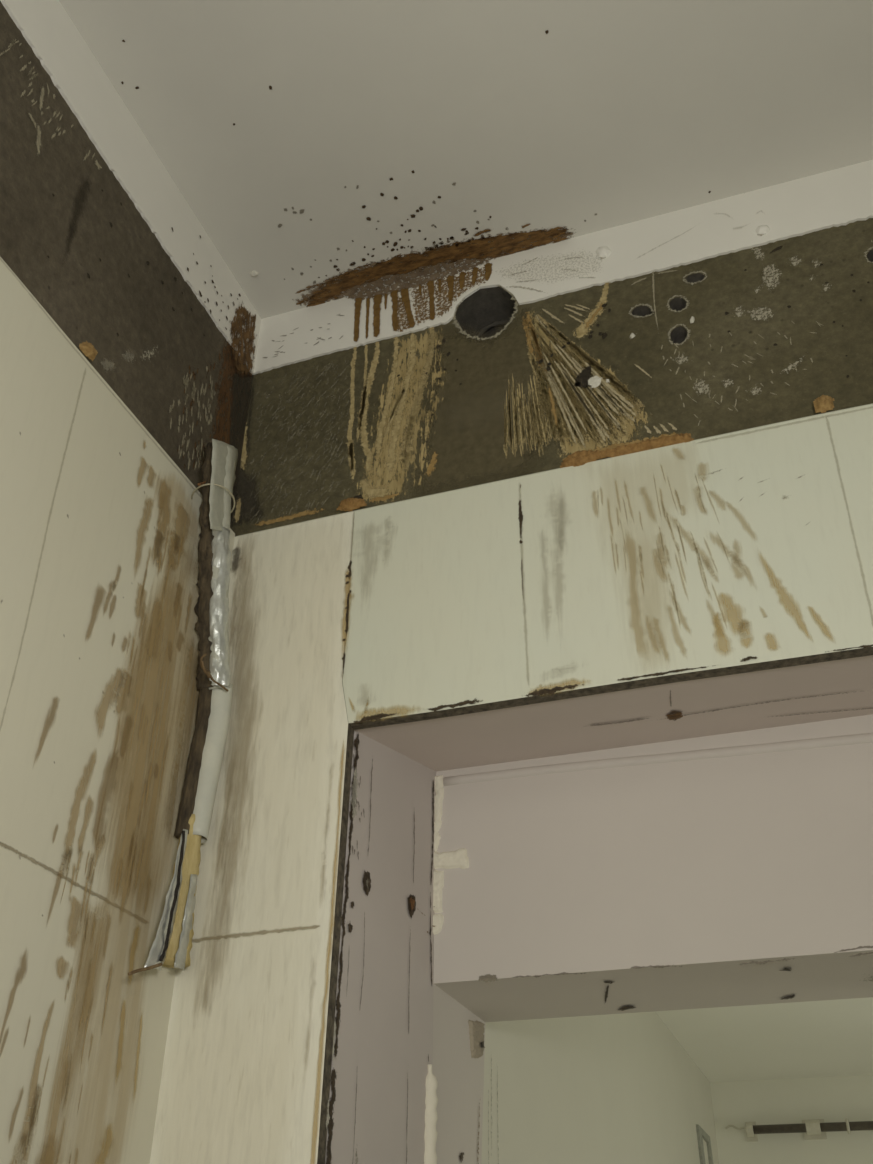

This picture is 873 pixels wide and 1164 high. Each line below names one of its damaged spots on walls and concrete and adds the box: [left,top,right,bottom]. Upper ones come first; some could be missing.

rust [284,196,573,342]
spalling [667,271,707,345]
spalling [574,365,610,389]
crack [517,484,525,599]
damp [10,442,198,1164]
damp [0,955,26,1055]